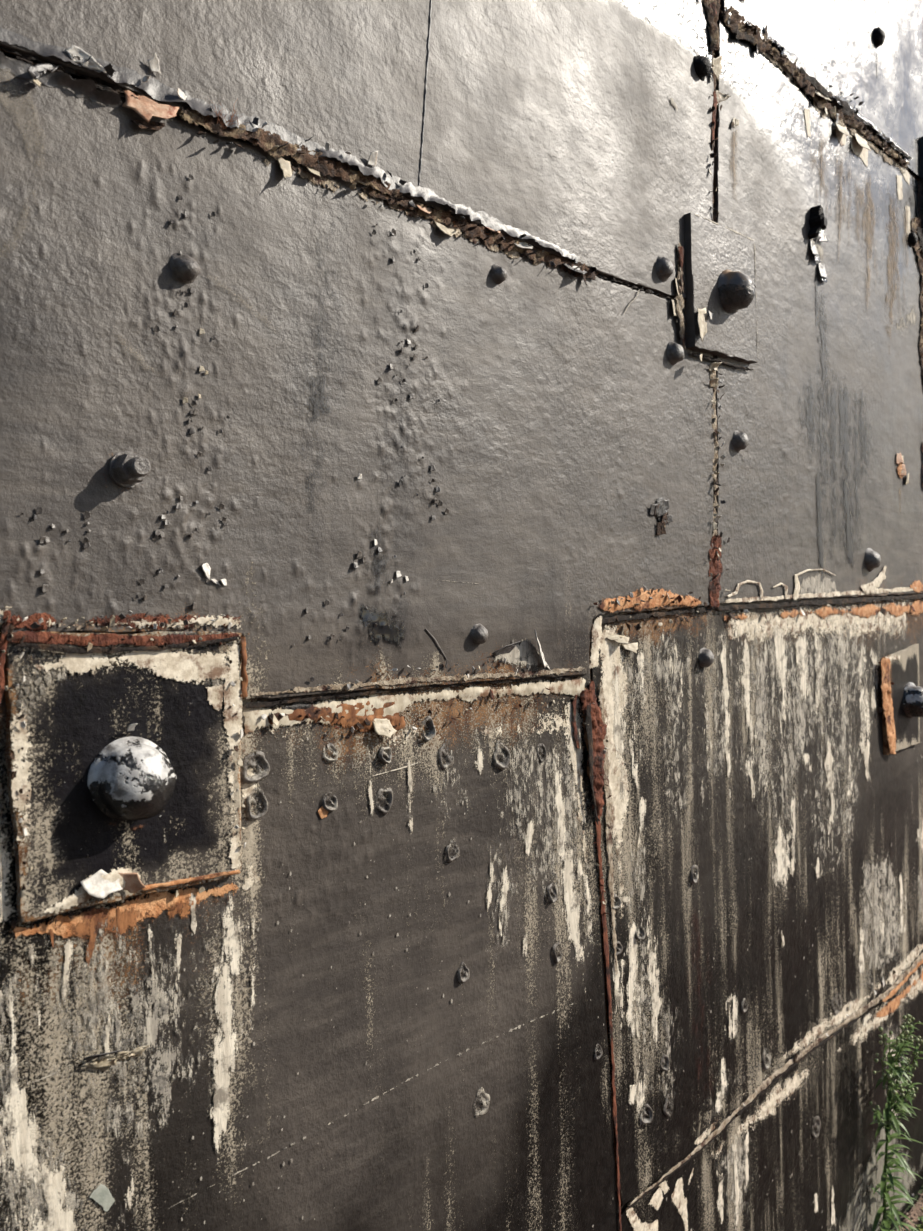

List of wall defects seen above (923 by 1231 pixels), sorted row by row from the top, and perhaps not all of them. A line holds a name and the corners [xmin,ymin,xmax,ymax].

peeling [27,45,115,87]
peeling [122,52,187,131]
peeling [353,539,409,595]
rust [0,535,923,818]
rust [49,908,153,966]
rust [167,889,229,919]
leakage [486,727,595,966]
leakage [611,614,923,1124]
leakage [0,893,258,1231]
leakage [813,1020,923,1231]
peeling [626,1160,699,1231]
leakage [715,1128,753,1230]